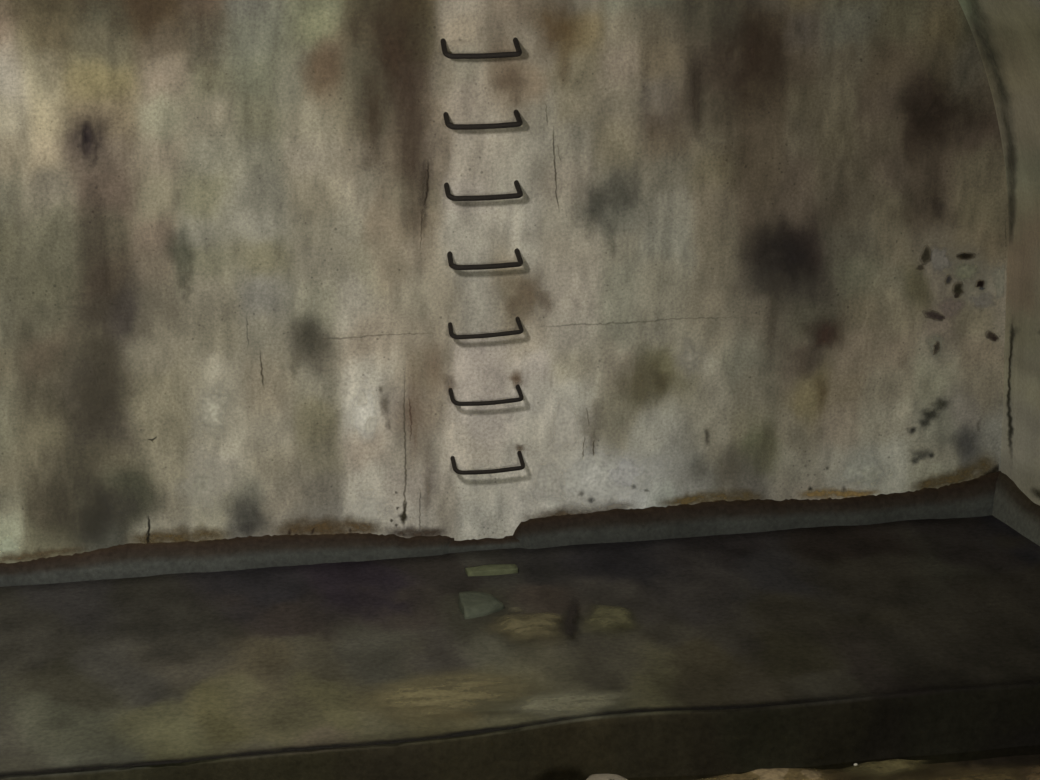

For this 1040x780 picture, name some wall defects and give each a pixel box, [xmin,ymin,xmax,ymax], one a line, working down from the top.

crack [546,107,558,202]
spalling [917,245,931,270]
spalling [956,252,976,260]
spalling [944,274,985,298]
spalling [922,309,945,321]
crack [390,392,421,526]
rust [919,459,994,489]
rust [668,492,753,505]
rust [805,490,874,498]